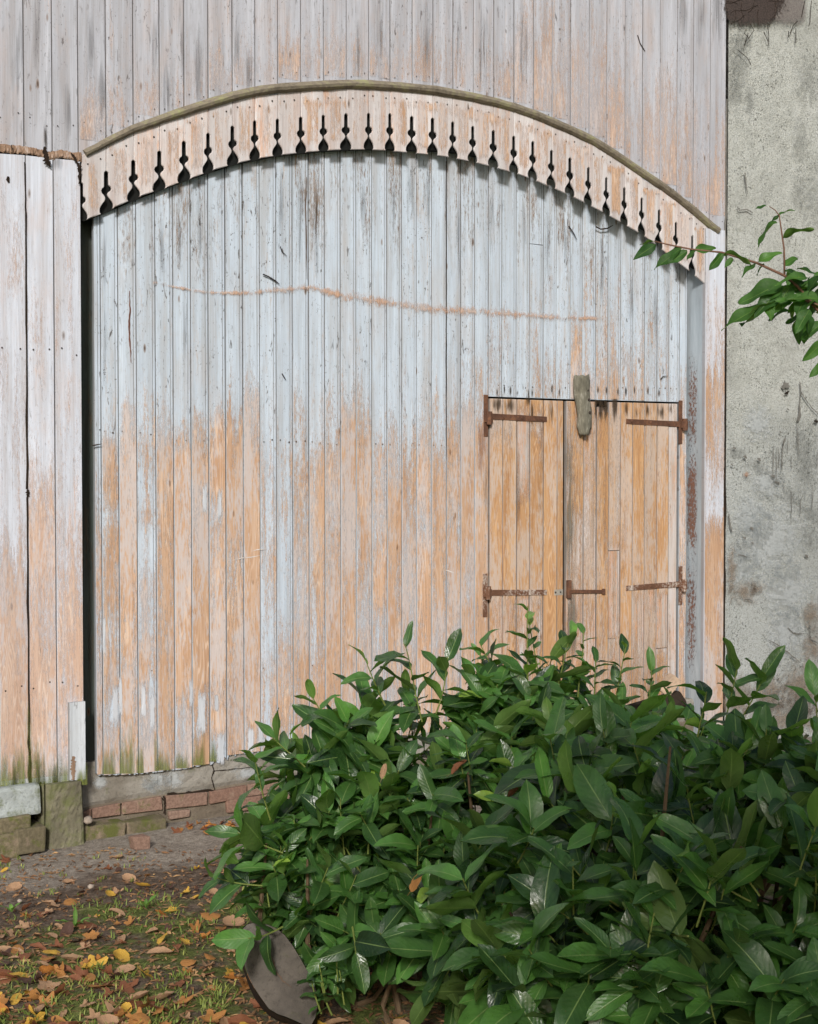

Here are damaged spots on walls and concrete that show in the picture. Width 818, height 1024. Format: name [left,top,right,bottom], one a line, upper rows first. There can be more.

peeling [96,0,725,791]
rust [687,362,697,546]
peeling [0,465,83,781]
rust [687,566,696,662]